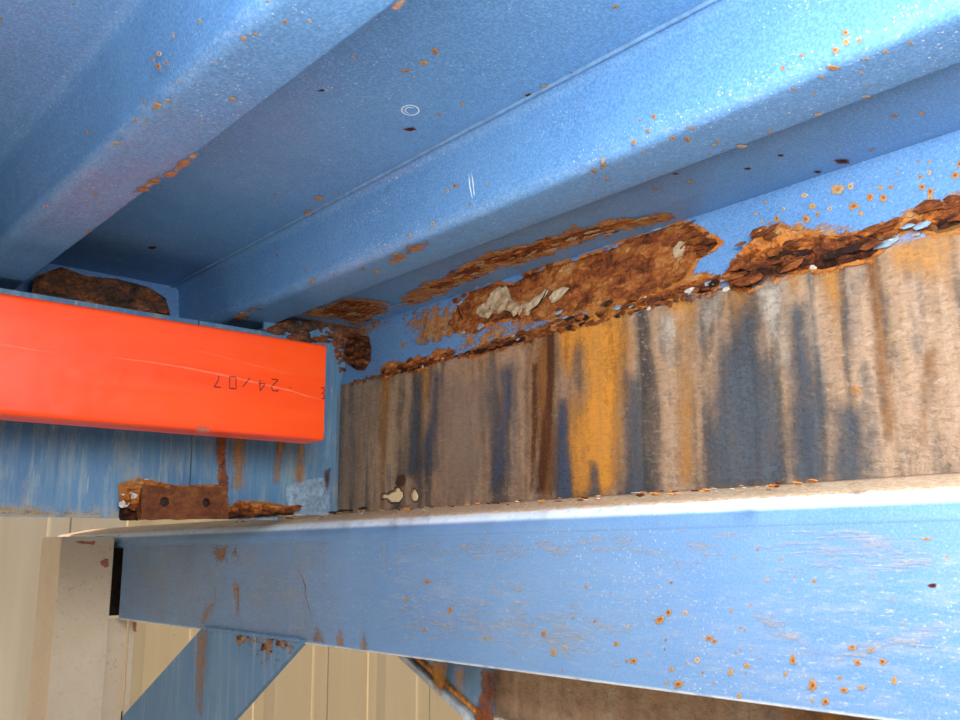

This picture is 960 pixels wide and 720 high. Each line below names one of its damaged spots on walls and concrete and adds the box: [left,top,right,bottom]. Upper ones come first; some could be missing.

corrosion [818,30,861,79]
corrosion [137,153,197,192]
peeling [873,231,920,250]
spalling [444,220,726,337]
corrosion [304,160,960,498]
corrosion [381,475,428,511]
corrosion [847,644,887,666]
corrosion [414,658,496,720]